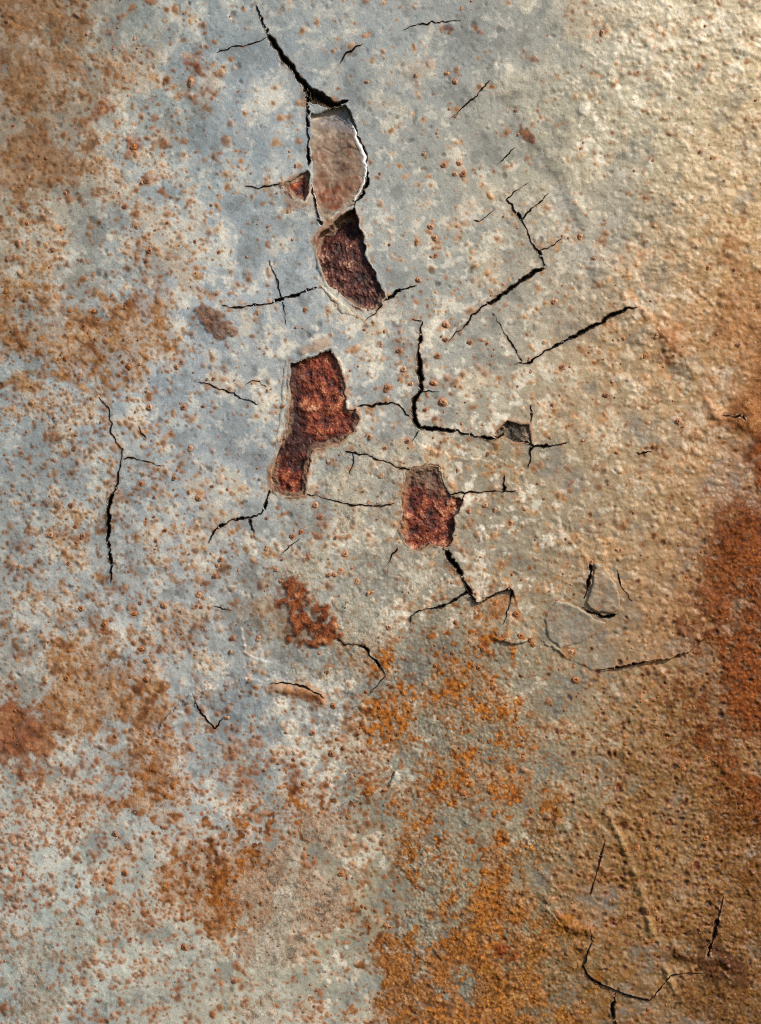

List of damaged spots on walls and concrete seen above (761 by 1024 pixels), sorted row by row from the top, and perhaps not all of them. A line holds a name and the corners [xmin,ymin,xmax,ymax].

crack [218,5,369,224]
rust [0,254,177,410]
crack [99,397,161,581]
rust [237,558,343,649]
peeling [268,346,362,500]
peeling [278,106,388,318]
peeling [397,463,466,554]
crack [410,546,515,623]
crack [359,319,567,507]
crack [448,182,637,364]
rust [0,592,613,1024]
rust [674,501,761,1024]